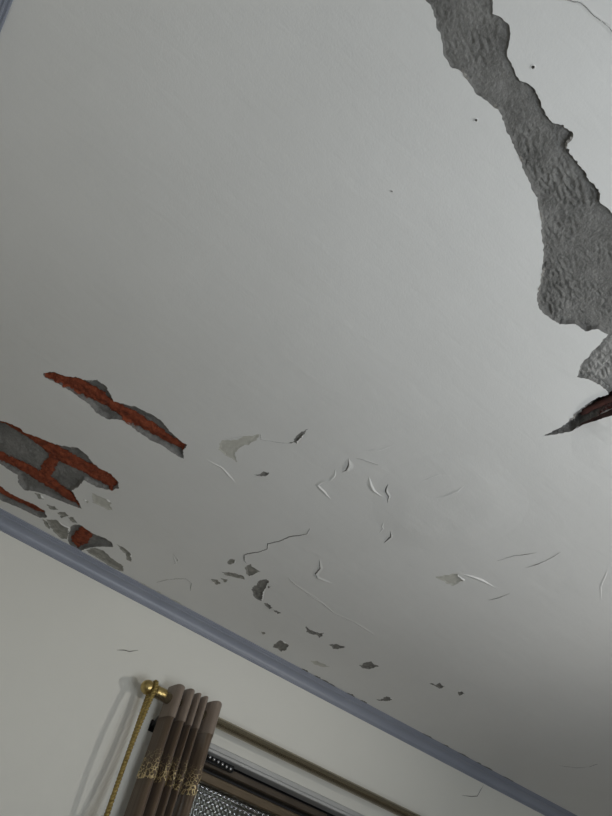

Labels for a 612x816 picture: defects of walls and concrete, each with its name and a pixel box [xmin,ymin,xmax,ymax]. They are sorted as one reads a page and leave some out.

crack [556,0,612,39]
spalling [426,0,612,436]
rust [0,486,45,513]
rust [0,421,119,508]
spalling [0,422,132,571]
rust [44,372,185,451]
spalling [43,373,187,459]
peeling [218,434,259,462]
peeling [211,559,281,614]
peeling [273,640,289,651]